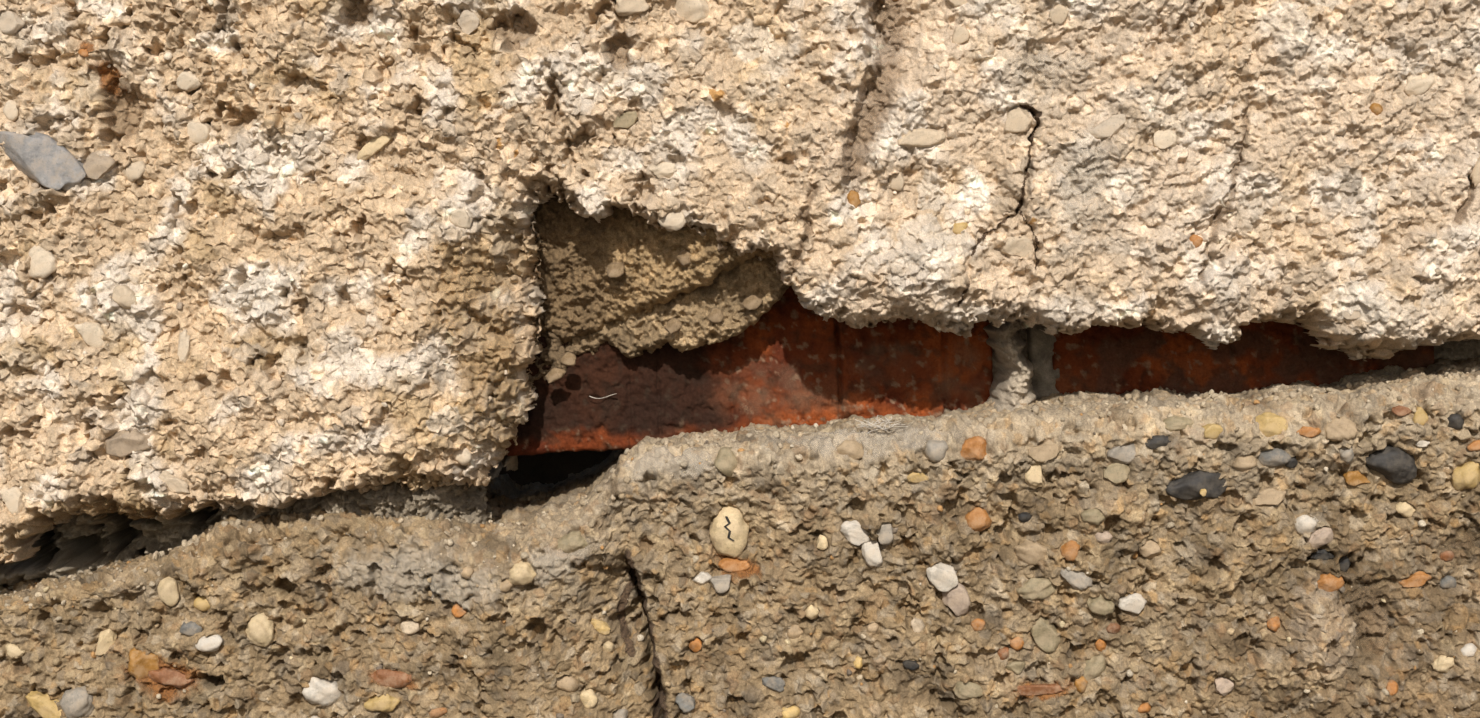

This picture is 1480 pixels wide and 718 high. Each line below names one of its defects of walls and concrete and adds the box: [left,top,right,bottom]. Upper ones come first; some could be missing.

spalling [526,194,790,389]
crack [616,549,668,718]